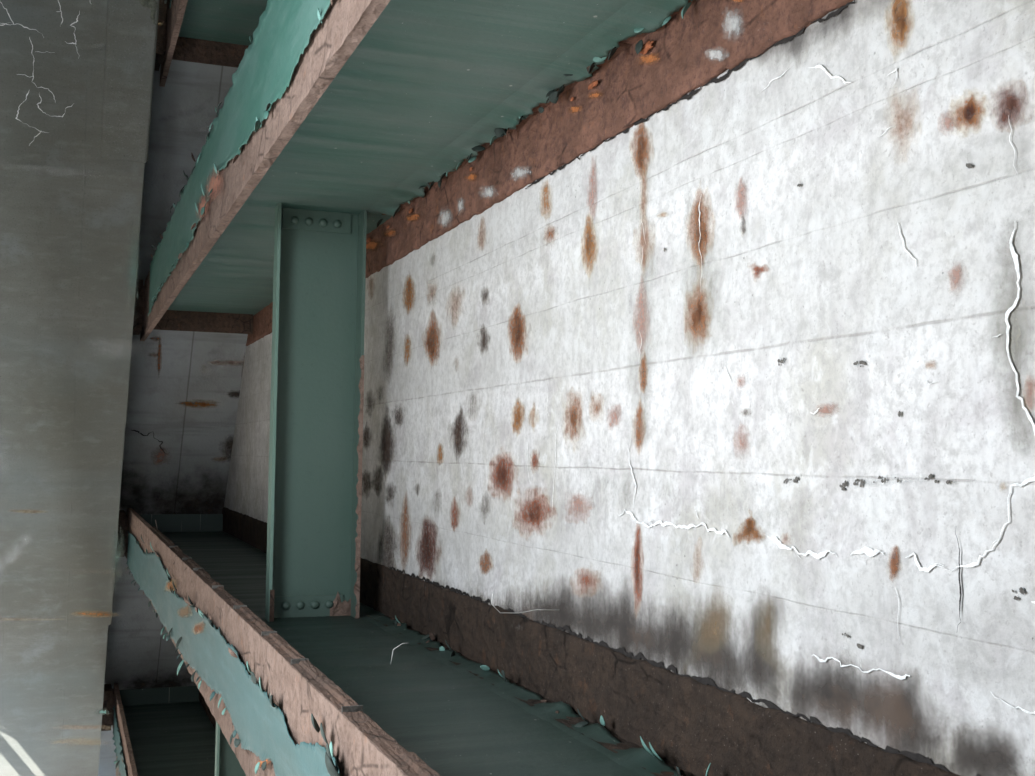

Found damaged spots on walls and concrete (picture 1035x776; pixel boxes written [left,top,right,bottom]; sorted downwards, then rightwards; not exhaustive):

peeling [148,0,333,315]
peeling [367,0,694,227]
crack [525,0,855,189]
rust [690,196,708,265]
rust [509,307,526,360]
crack [994,229,1035,436]
rust [490,457,513,496]
peeling [126,531,340,776]
leakage [506,588,777,696]
crack [389,566,949,772]
leakage [791,667,936,754]
leakage [955,736,1018,776]